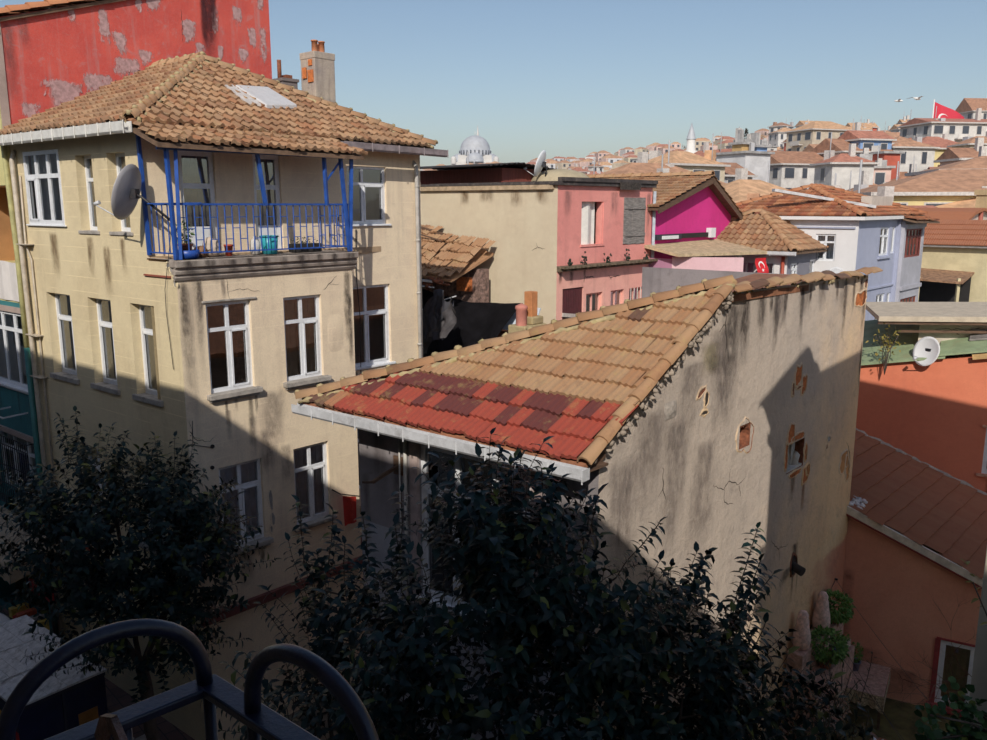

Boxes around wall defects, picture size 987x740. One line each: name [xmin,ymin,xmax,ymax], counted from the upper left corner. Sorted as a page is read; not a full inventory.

peeling [22,9,154,117]
peeling [135,0,160,13]
peeling [182,19,206,53]
peeling [232,6,267,64]
leakage [719,294,788,361]
flaking render [696,384,710,417]
flaking render [791,363,808,398]
flaking render [783,422,810,486]